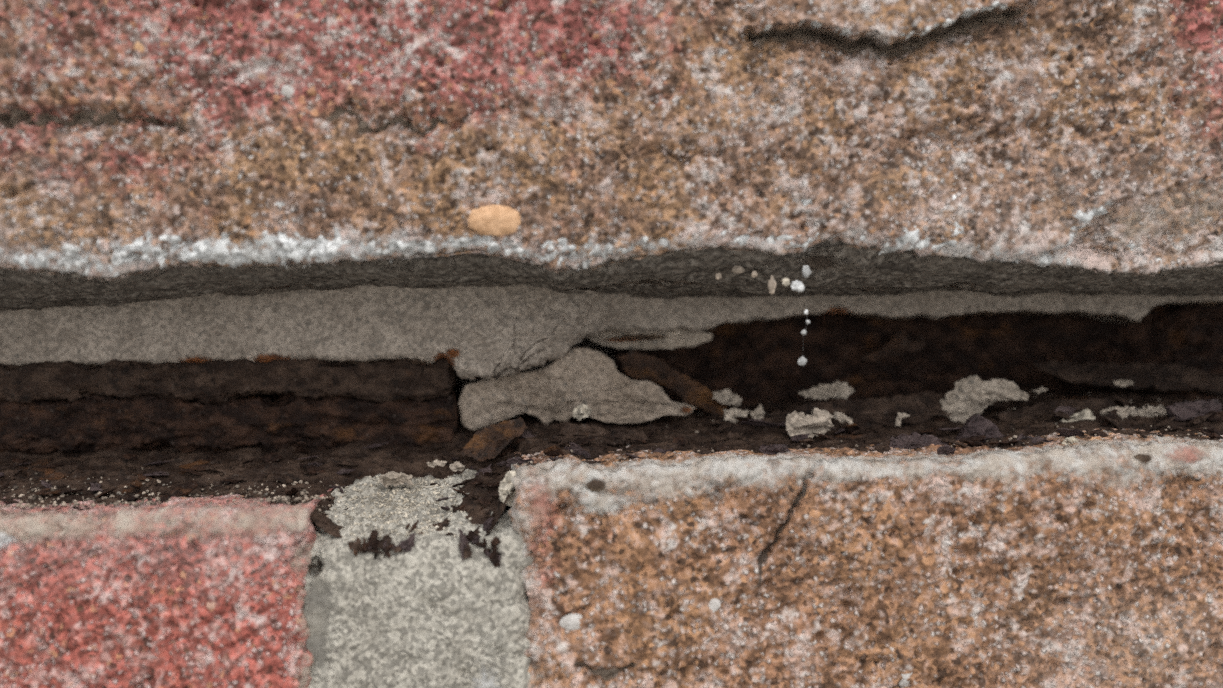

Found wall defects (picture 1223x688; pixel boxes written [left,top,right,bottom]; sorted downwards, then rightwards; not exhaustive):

crack [748,1,1022,58]
crack [757,464,815,587]